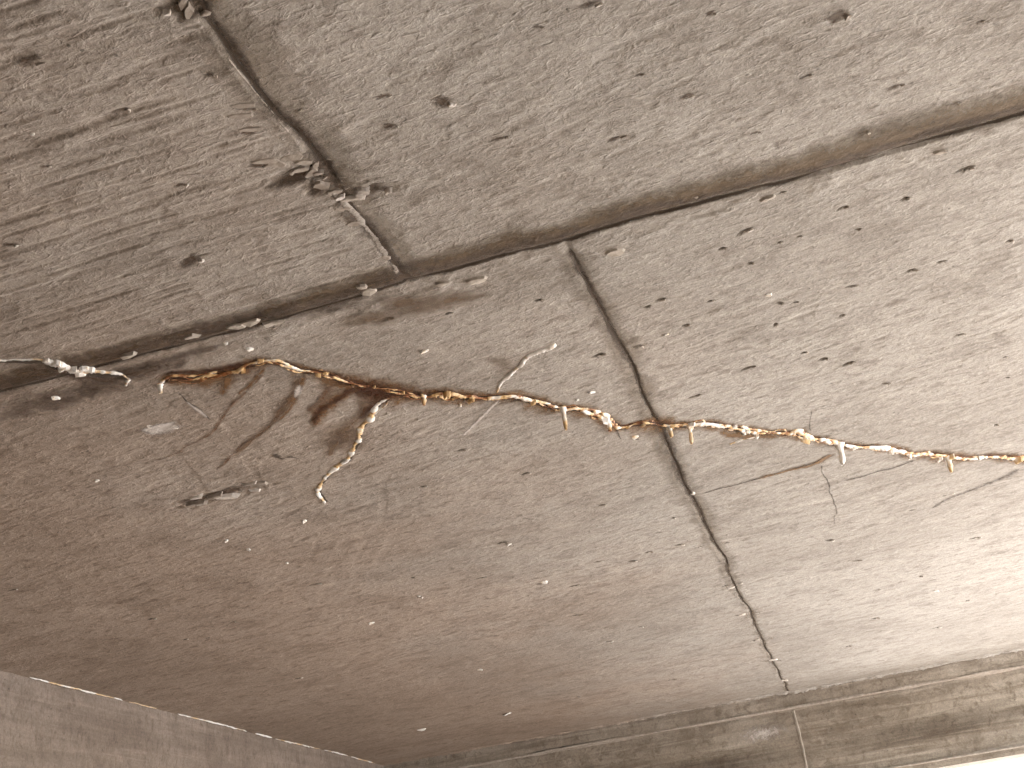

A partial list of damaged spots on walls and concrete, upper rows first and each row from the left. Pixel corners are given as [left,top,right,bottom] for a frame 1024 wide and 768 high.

spalling [277,159,392,212]
crack [0,358,131,386]
crack [156,343,1024,524]
spalling [186,481,268,506]